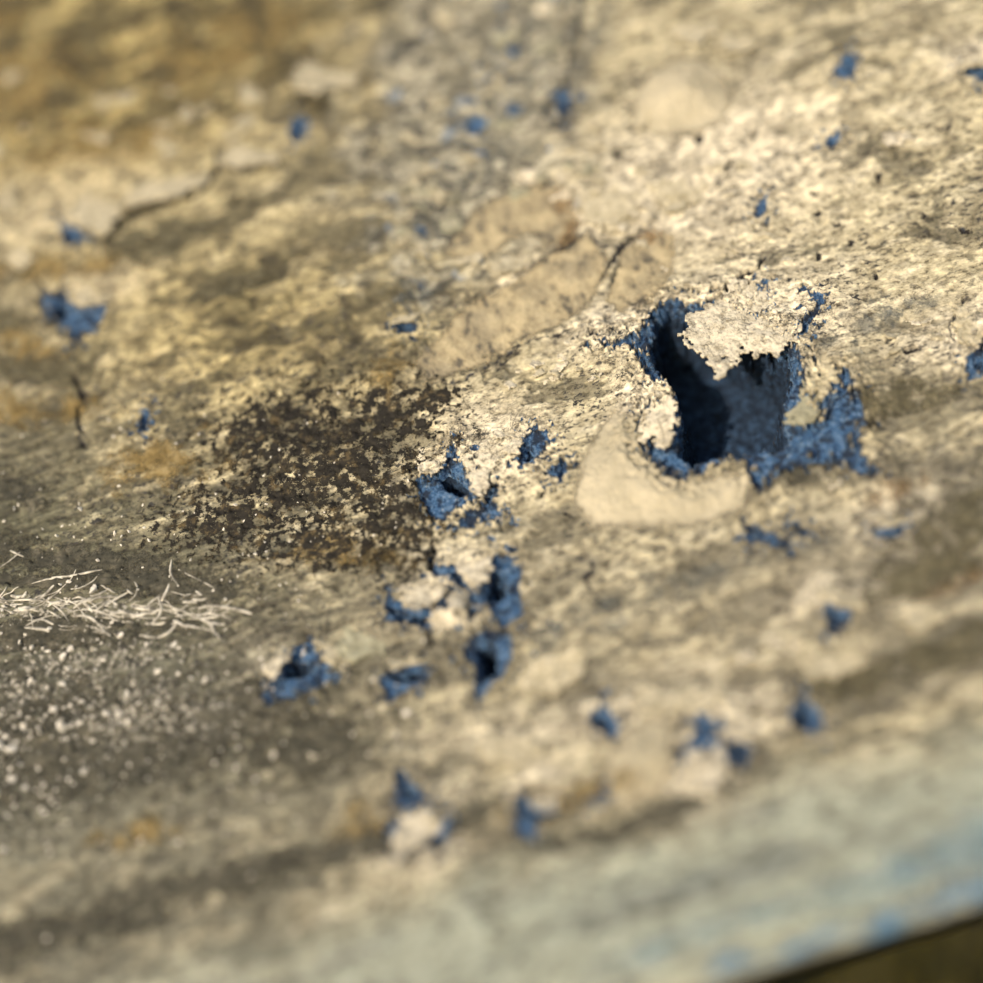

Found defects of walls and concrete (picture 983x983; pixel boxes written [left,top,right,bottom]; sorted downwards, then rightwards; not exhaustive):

peeling [44,61,359,257]
hole [29,279,115,361]
crack [456,247,555,308]
crack [449,319,606,385]
crack [587,227,651,280]
spalling [382,122,892,508]
peeling [906,303,983,392]
crack [73,376,100,448]
spalling [370,416,586,714]
spalling [732,506,828,563]
spalling [253,625,438,717]
spalling [373,746,470,867]